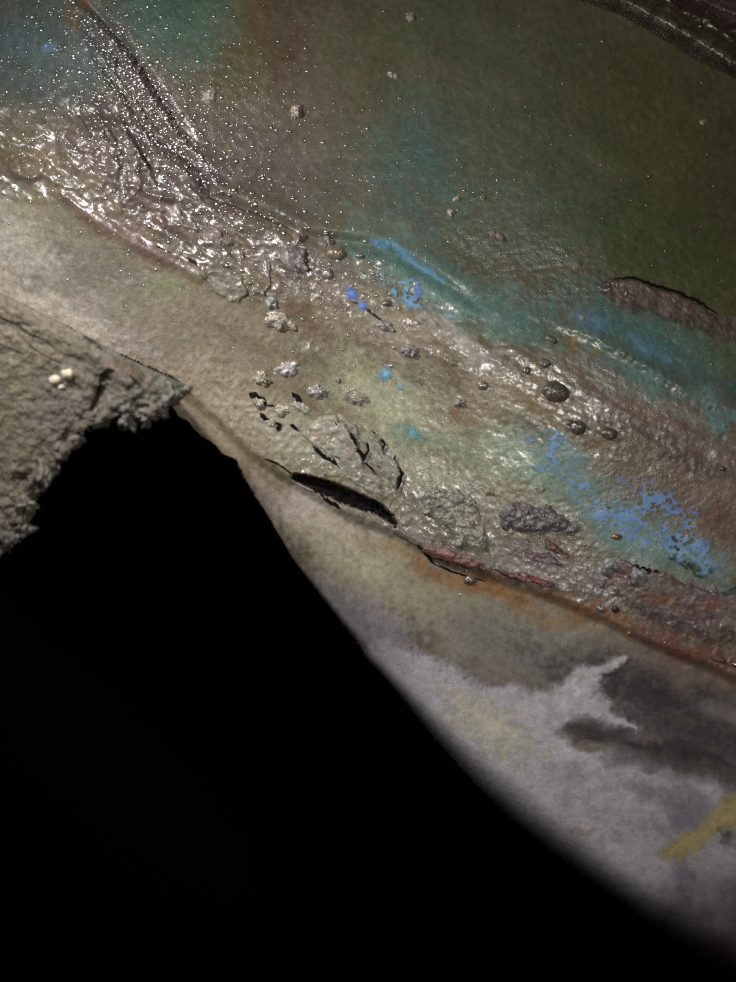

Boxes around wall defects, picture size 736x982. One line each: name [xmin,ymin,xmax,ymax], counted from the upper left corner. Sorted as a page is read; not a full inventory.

spalling [0,375,194,558]
crack [264,420,404,528]
peeling [369,434,401,484]
crack [417,545,486,582]
leakage [361,635,736,979]